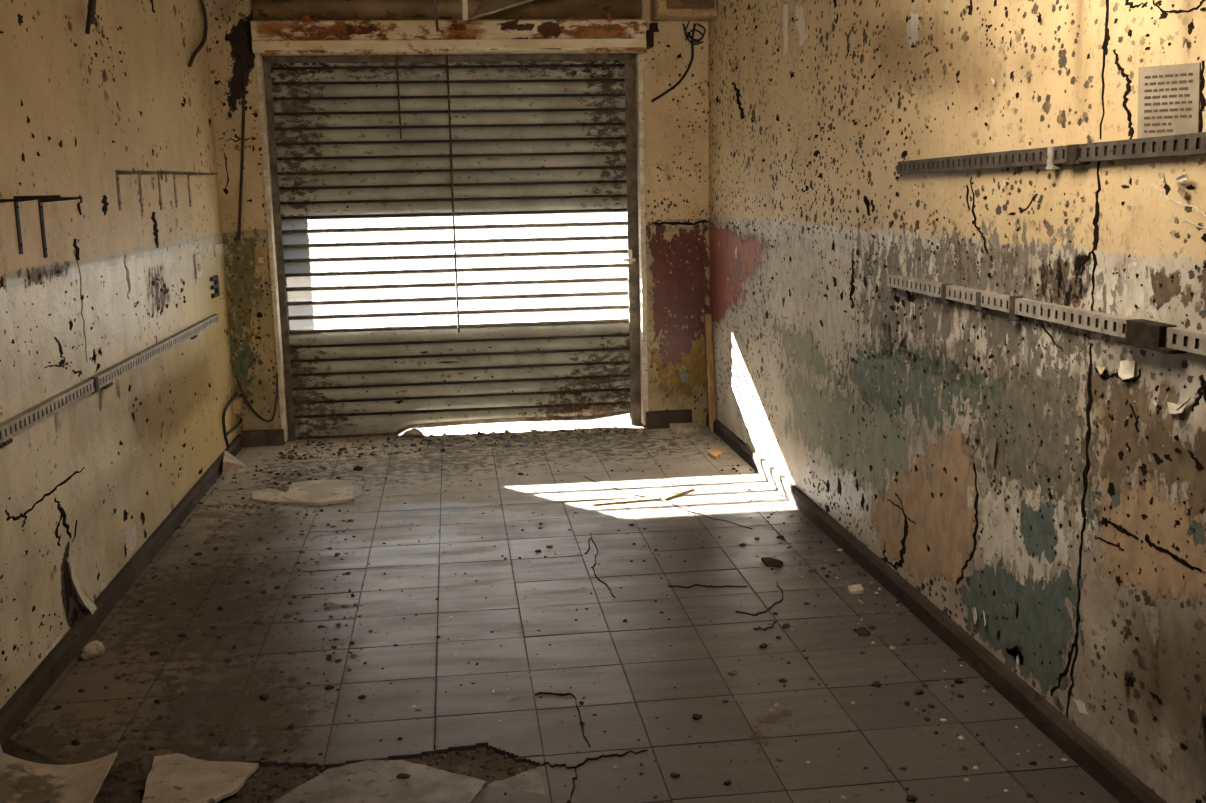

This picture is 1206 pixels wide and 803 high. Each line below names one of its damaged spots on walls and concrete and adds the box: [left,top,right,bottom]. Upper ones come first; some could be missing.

rust [257,11,650,229]
peeling [724,0,810,123]
flaking render [847,0,939,158]
peeling [968,0,1025,48]
crack [1080,0,1134,311]
crack [1150,181,1206,231]
crack [1198,60,1206,133]
crack [5,467,85,528]
crack [586,533,615,598]
peeling [646,114,1206,803]
crack [1050,344,1204,717]
crack [535,692,647,803]